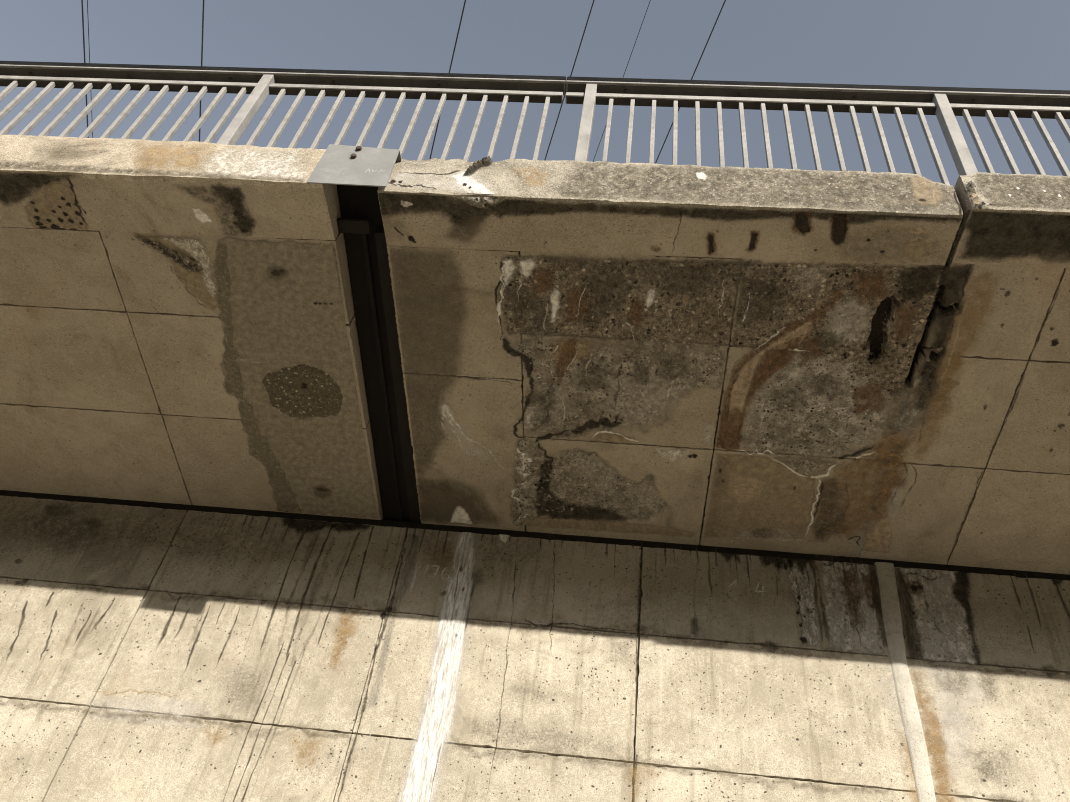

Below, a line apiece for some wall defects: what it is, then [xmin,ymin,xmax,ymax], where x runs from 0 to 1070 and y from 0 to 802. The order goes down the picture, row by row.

leakage [182,186,253,235]
leakage [378,172,495,239]
crack [919,181,971,440]
spalling [262,364,343,419]
spalling [513,335,727,435]
corrosion [716,289,842,450]
spalling [741,288,943,457]
crack [953,271,1065,546]
leakage [392,252,504,802]
spalling [535,450,667,521]
crack [774,446,874,537]
leakage [664,545,888,653]